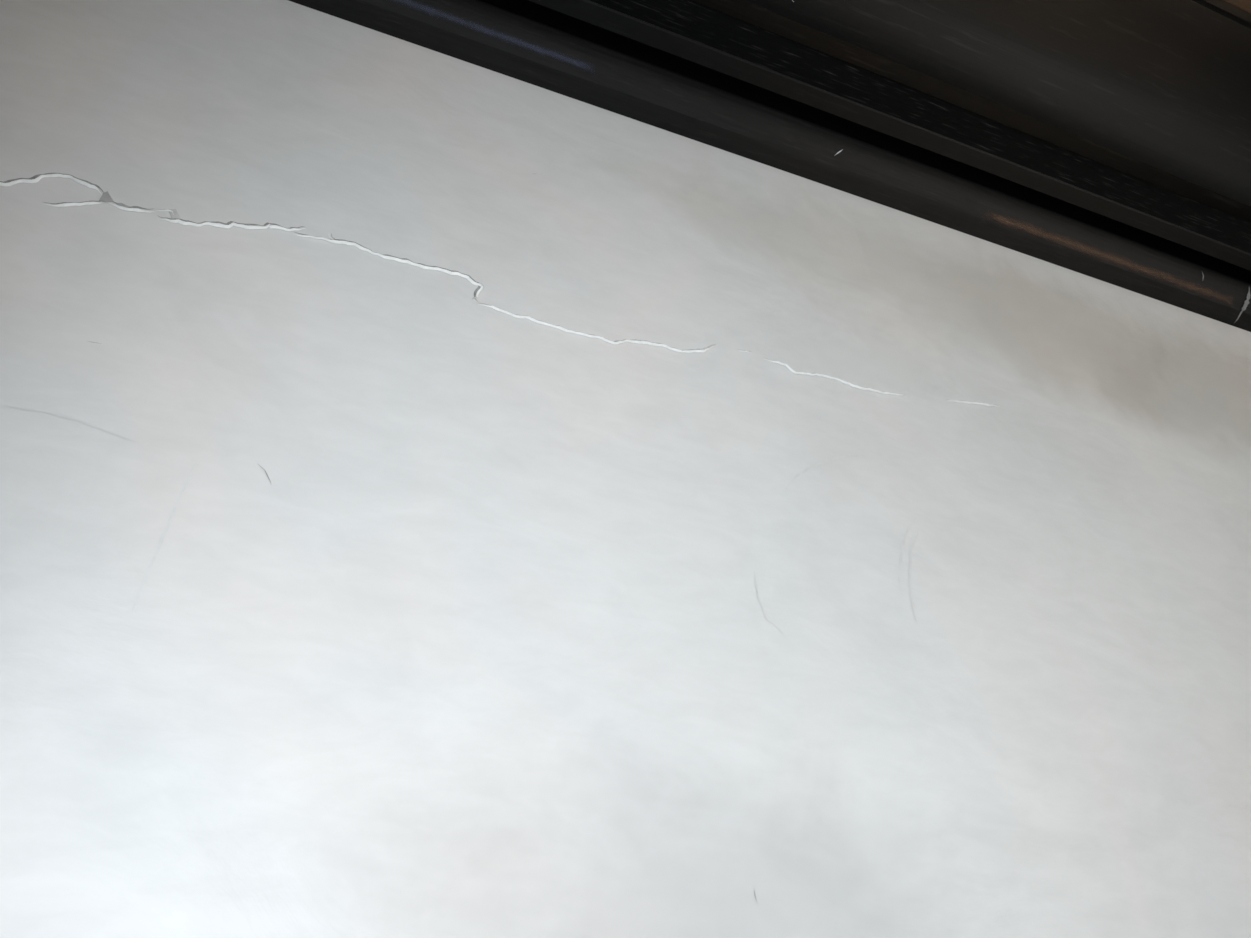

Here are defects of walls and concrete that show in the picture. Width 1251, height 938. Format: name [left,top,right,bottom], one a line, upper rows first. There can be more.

crack [0,173,905,396]